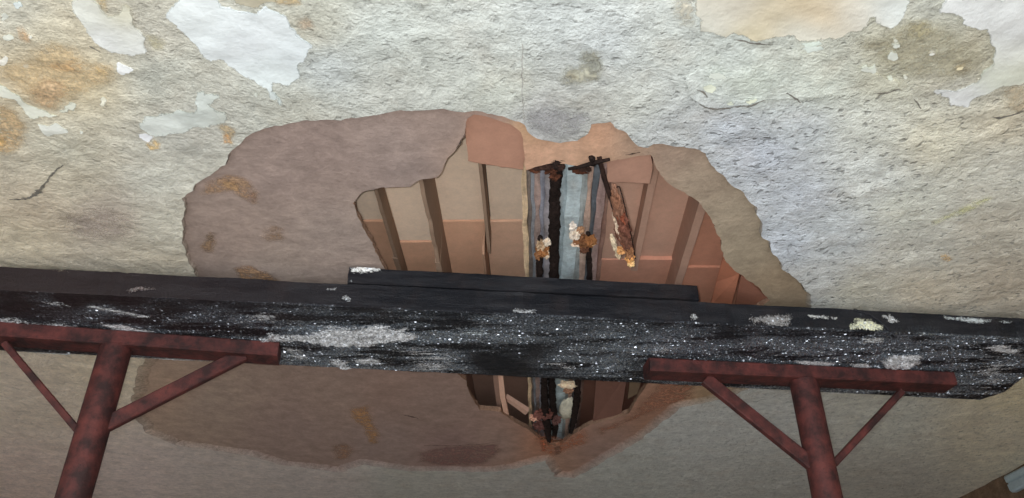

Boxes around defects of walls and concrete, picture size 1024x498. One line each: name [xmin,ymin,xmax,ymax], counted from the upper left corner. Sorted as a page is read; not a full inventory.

peeling [72,0,146,75]
peeling [166,0,312,105]
peeling [695,0,910,61]
peeling [861,64,907,81]
peeling [934,0,1024,108]
peeling [139,91,227,142]
crack [9,165,64,200]
spalling [182,109,812,308]
corrosion [529,160,592,182]
spalling [131,358,213,402]
spalling [136,363,719,478]